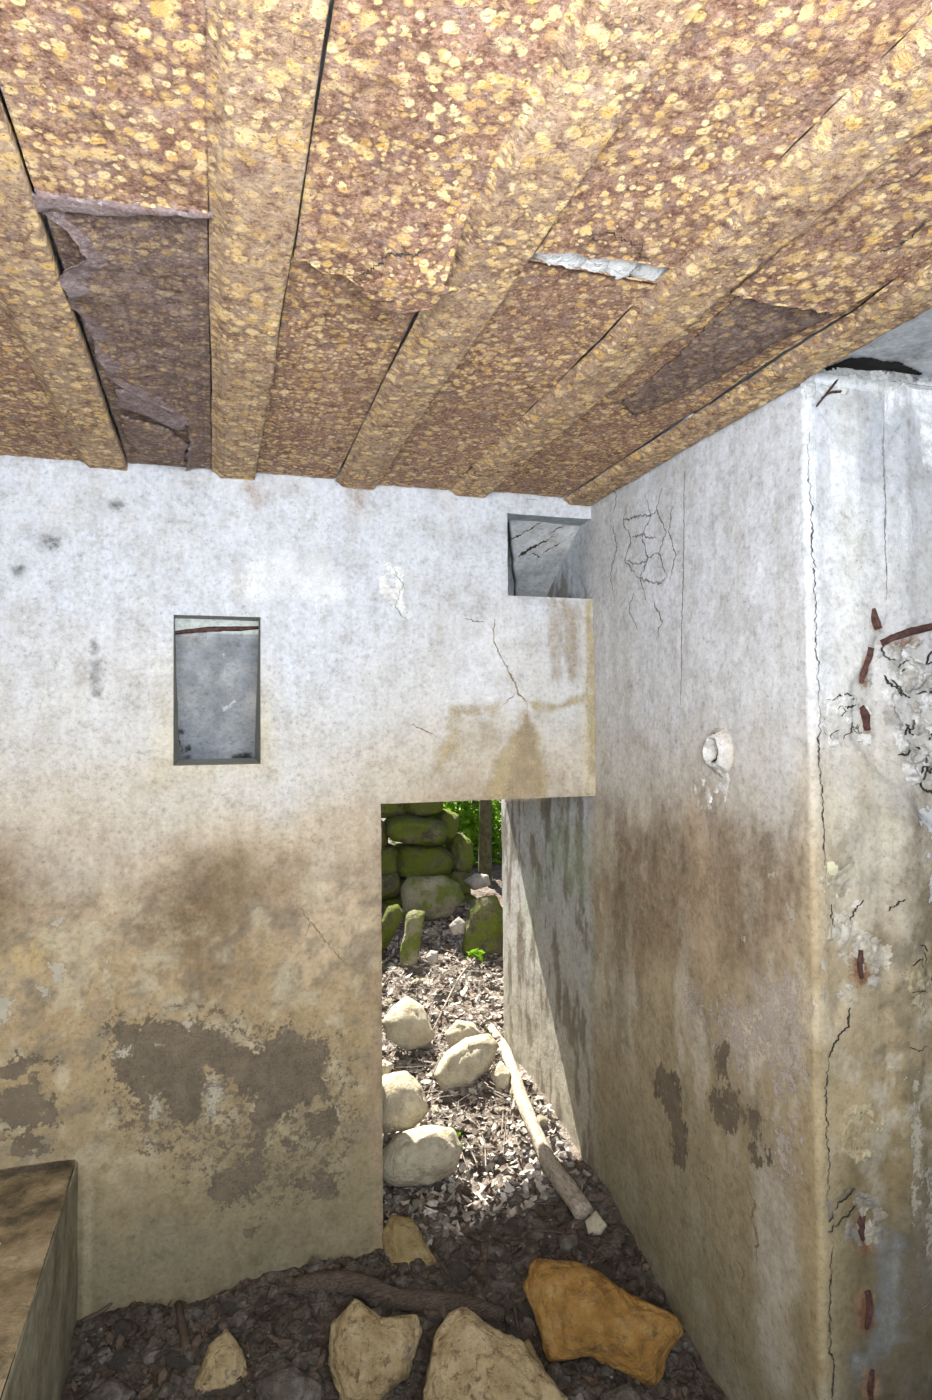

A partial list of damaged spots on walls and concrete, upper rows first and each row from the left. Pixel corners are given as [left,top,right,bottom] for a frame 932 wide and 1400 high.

crack [467,618,528,718]
crack [610,476,685,705]
crack [807,437,826,879]
spalling [817,608,932,904]
crack [824,1056,832,1200]
crack [827,1239,835,1398]